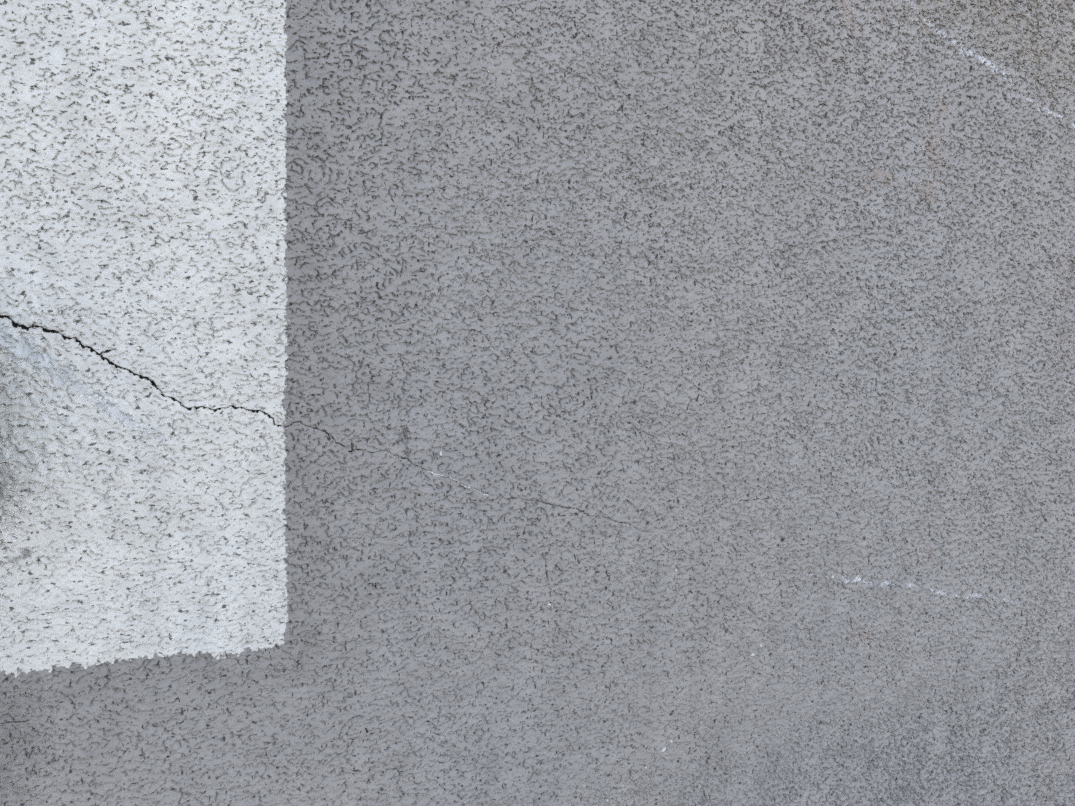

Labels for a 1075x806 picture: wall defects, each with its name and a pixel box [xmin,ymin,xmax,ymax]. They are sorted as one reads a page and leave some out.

crack [0,315,647,532]